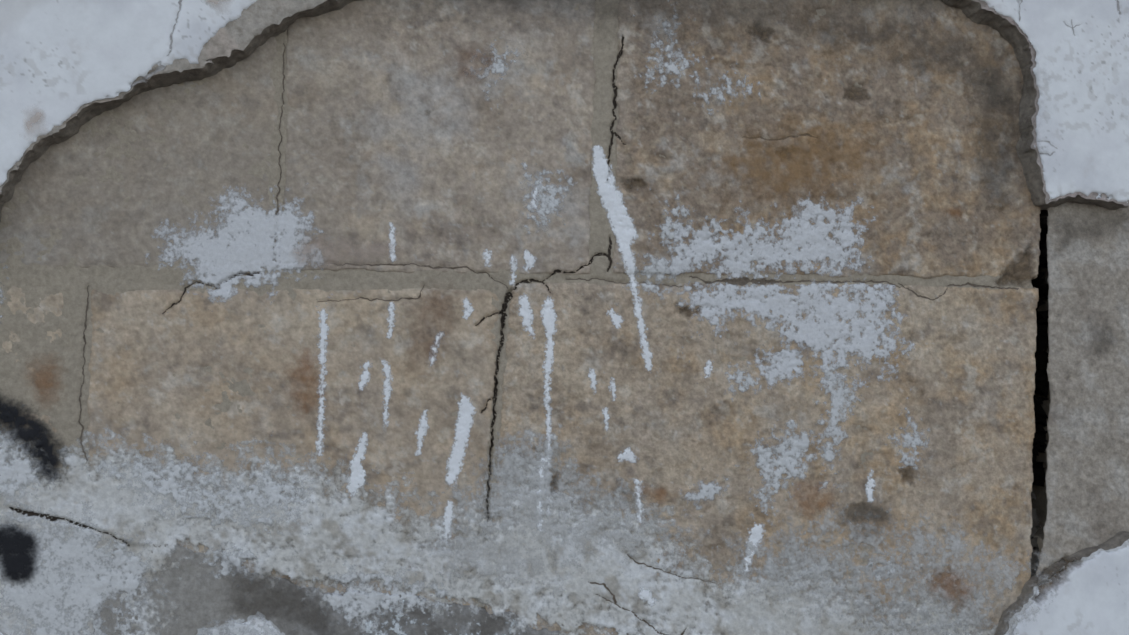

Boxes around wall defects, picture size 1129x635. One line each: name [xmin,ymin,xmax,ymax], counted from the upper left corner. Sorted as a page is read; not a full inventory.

spalling [0,0,361,222]
crack [162,43,285,314]
peeling [146,186,326,305]
crack [607,37,626,180]
spalling [940,0,1128,210]
crack [9,507,130,546]
peeling [0,431,167,635]
peeling [96,445,313,581]
peeling [313,566,453,632]
crack [627,554,714,583]
crack [317,210,1049,577]
peeling [626,191,1129,635]